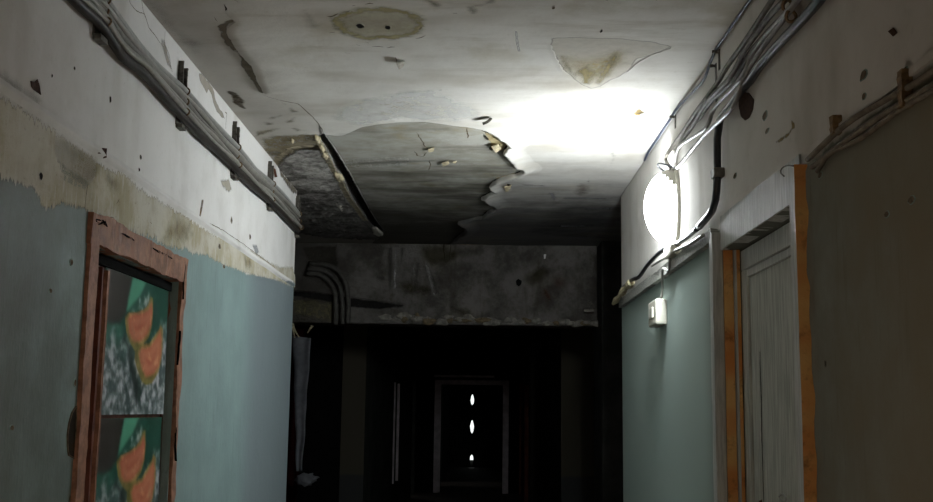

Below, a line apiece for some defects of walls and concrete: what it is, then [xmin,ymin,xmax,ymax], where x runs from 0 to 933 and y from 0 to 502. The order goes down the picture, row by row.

peeling [0,97,295,288]
peeling [199,74,227,118]
damp [328,3,424,40]
peeling [218,4,543,244]